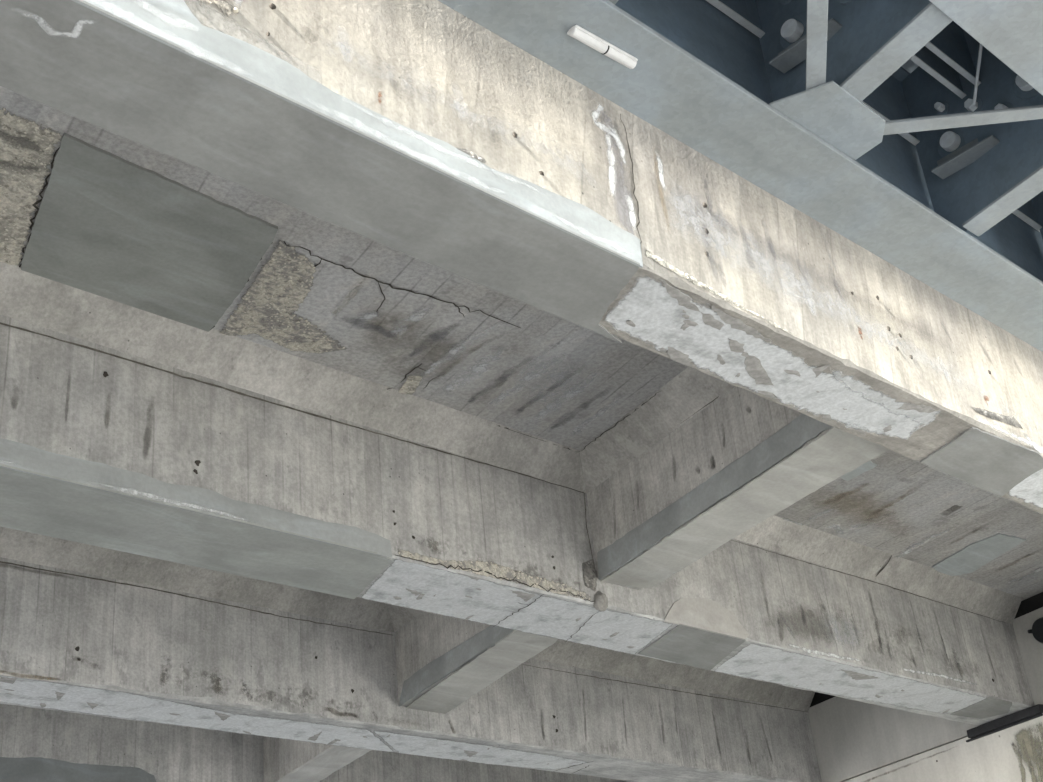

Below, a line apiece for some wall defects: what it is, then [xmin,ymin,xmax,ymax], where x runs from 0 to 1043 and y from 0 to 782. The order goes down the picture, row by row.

spalling [0,108,62,265]
crack [19,147,60,267]
crack [620,114,642,243]
spalling [220,241,346,353]
crack [247,241,520,328]
peeling [605,250,939,439]
peeling [1009,469,1043,508]
peeling [362,549,672,654]
damp [1012,725,1043,782]